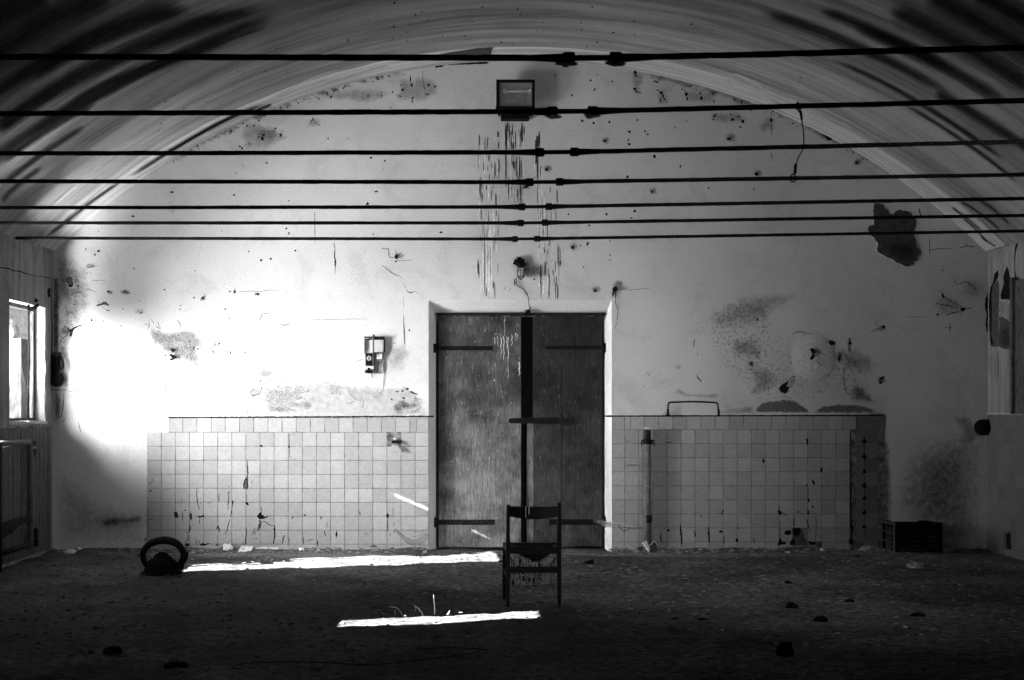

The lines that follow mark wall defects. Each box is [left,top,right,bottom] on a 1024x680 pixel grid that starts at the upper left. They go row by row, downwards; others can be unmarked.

leakage [477,123,561,299]
flaking render [867,203,921,267]
peeling [91,290,202,369]
flaking render [985,267,1010,349]
peeling [246,379,421,416]
leakage [757,382,872,413]